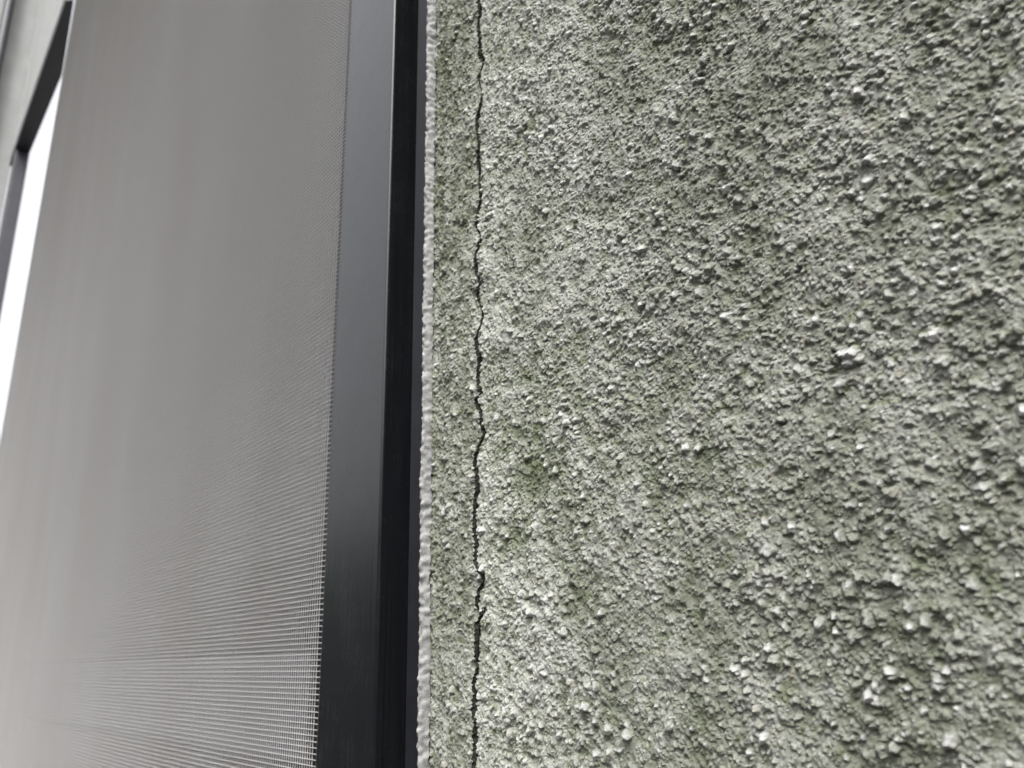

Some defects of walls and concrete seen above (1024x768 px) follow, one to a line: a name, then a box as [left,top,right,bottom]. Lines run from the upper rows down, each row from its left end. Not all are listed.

crack [469,0,486,768]